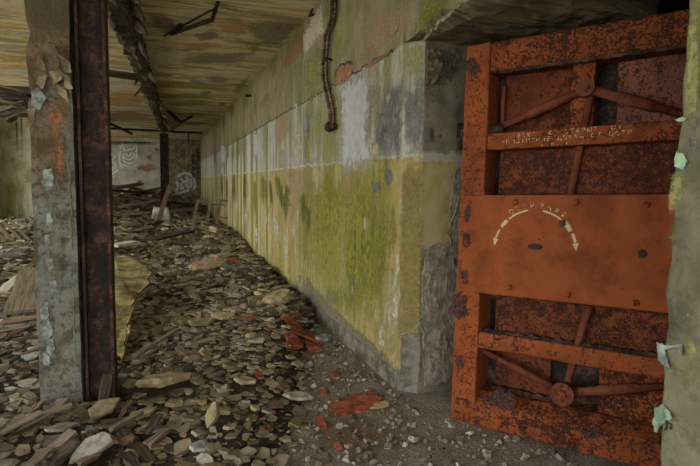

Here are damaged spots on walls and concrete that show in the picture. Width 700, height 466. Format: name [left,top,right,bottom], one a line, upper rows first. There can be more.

peeling [0,42,73,128]
spalling [334,61,353,85]
damp [379,252,401,346]
peeling [418,167,462,388]
corrosion [449,269,469,320]
corrosion [491,294,669,315]
corrosion [484,328,658,358]
corrosion [483,384,553,412]